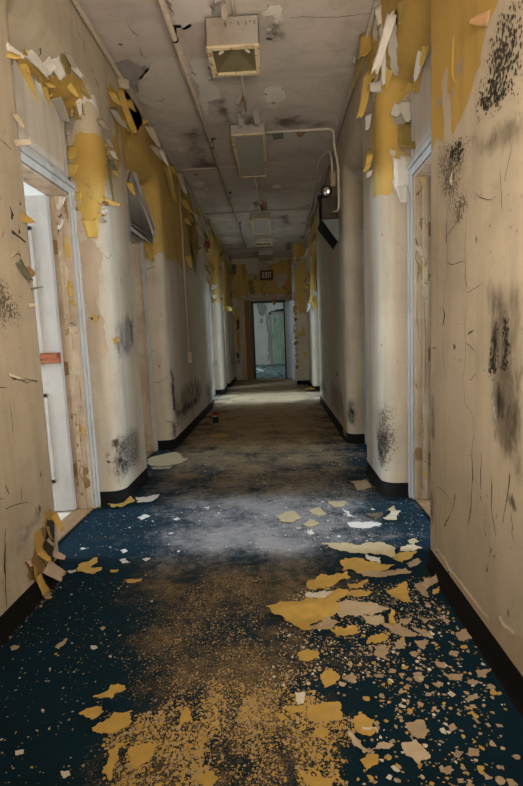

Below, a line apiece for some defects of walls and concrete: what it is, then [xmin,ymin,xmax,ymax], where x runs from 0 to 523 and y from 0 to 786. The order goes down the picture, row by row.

peeling [352,0,498,203]
leakage [477,0,523,121]
leakage [437,136,470,224]
peeling [2,0,318,496]
leakage [0,277,19,327]
crack [432,222,513,539]
leakage [489,311,511,448]
leakage [106,427,140,475]
leakage [377,402,398,471]
peeling [96,496,135,508]
flaking render [18,509,130,596]